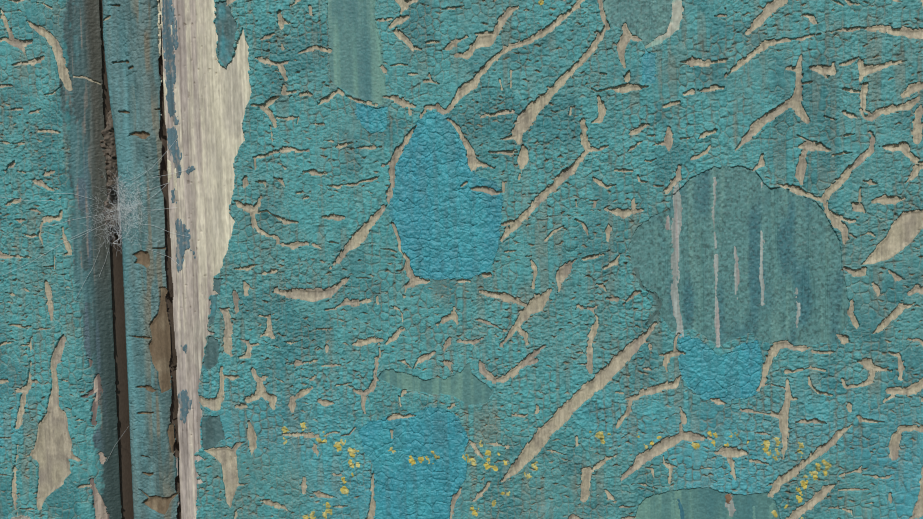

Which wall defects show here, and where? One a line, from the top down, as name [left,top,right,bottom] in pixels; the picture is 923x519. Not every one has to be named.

peeling [277,10,291,30]
crack [0,0,103,515]
peeling [133,251,150,268]
peeling [141,0,252,519]
crack [198,0,923,519]
peeling [861,210,923,265]
peeling [30,335,81,510]
crack [78,478,110,519]